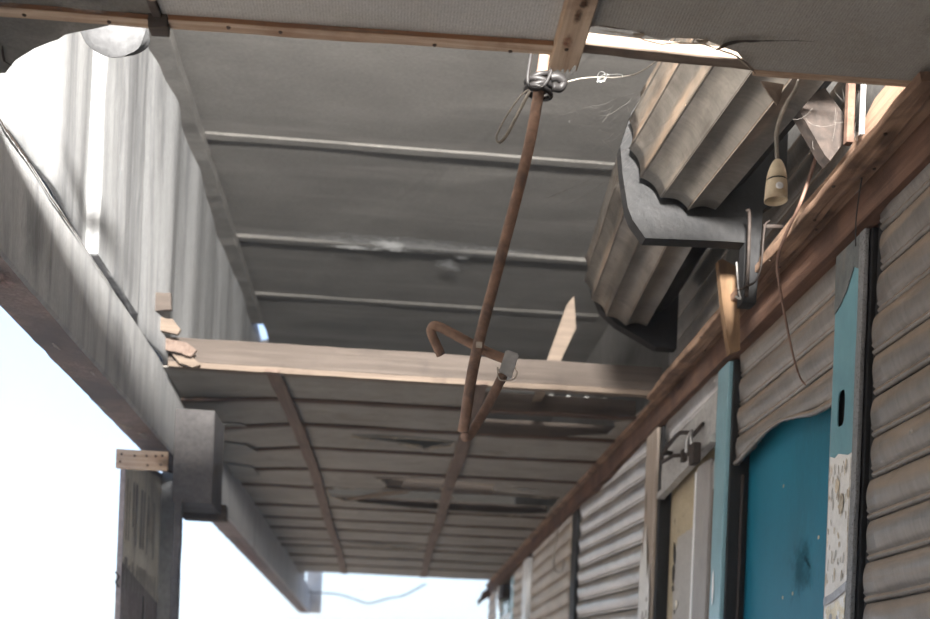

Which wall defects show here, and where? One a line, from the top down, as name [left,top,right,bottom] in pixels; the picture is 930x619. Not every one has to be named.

spalling [601,30,752,71]
peeling [760,81,784,106]
peeling [818,459,851,586]